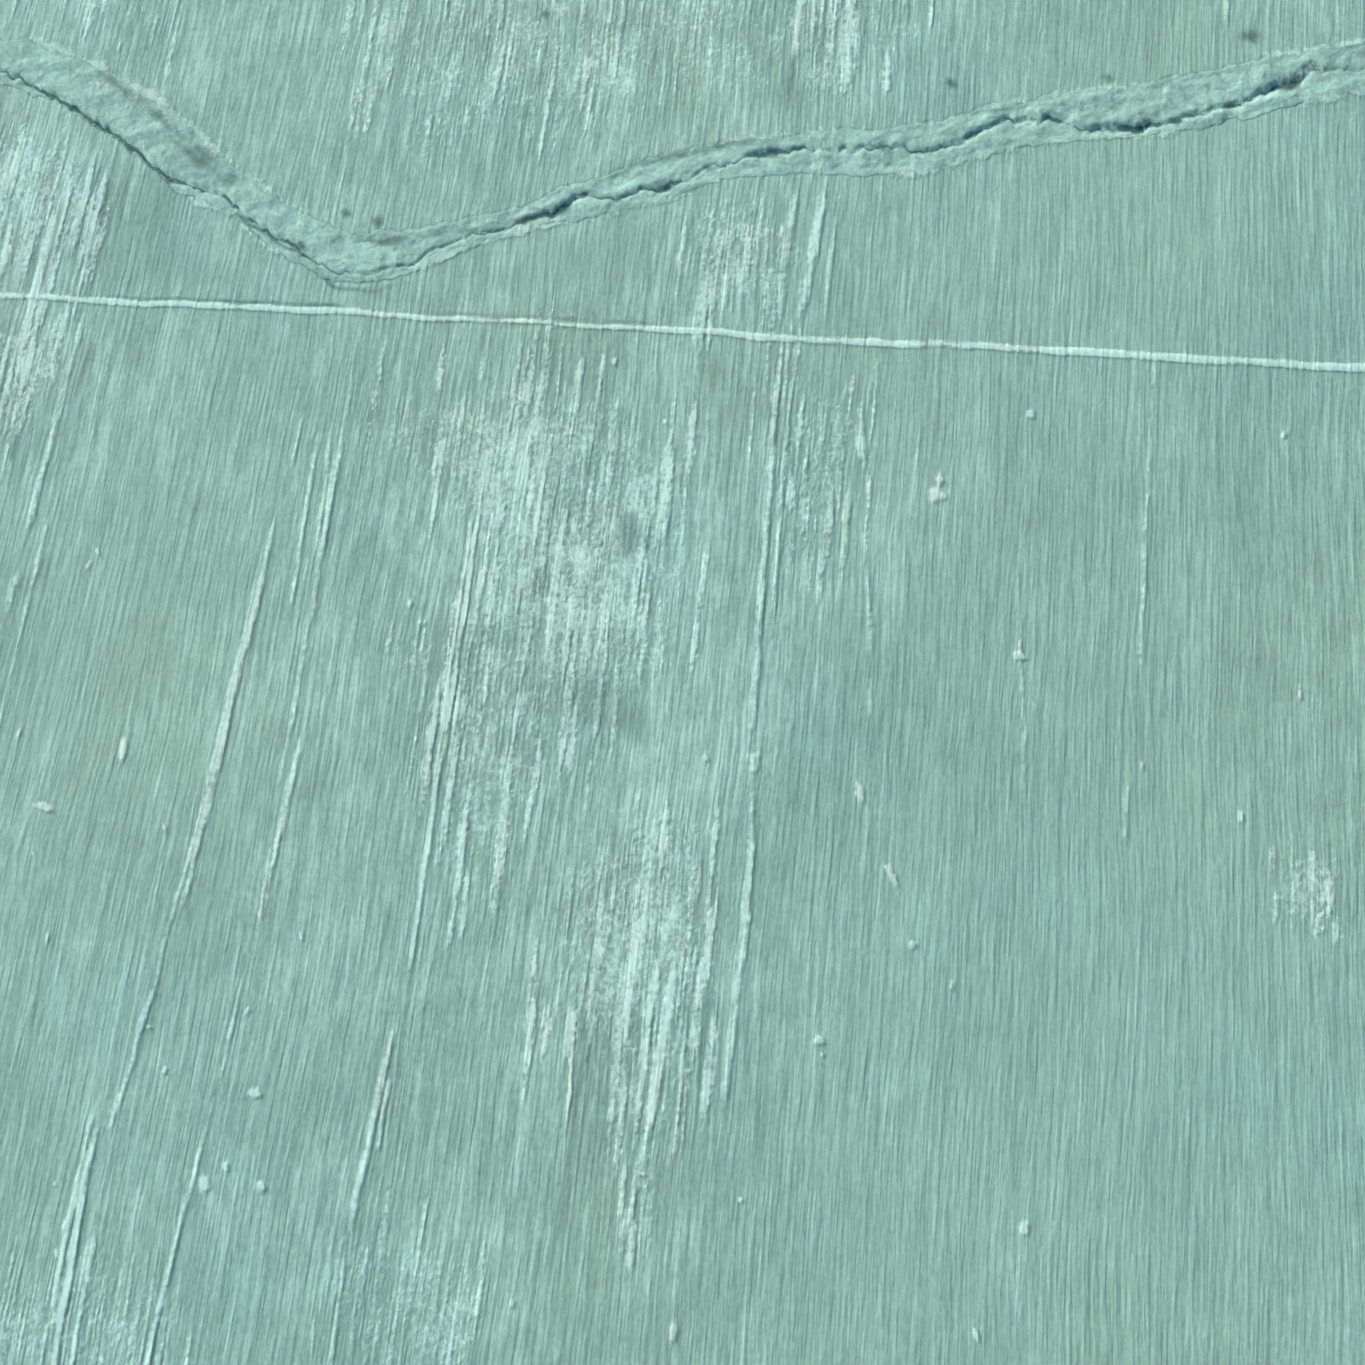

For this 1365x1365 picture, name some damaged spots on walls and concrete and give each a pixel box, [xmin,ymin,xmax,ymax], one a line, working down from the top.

crack [0,38,1365,283]